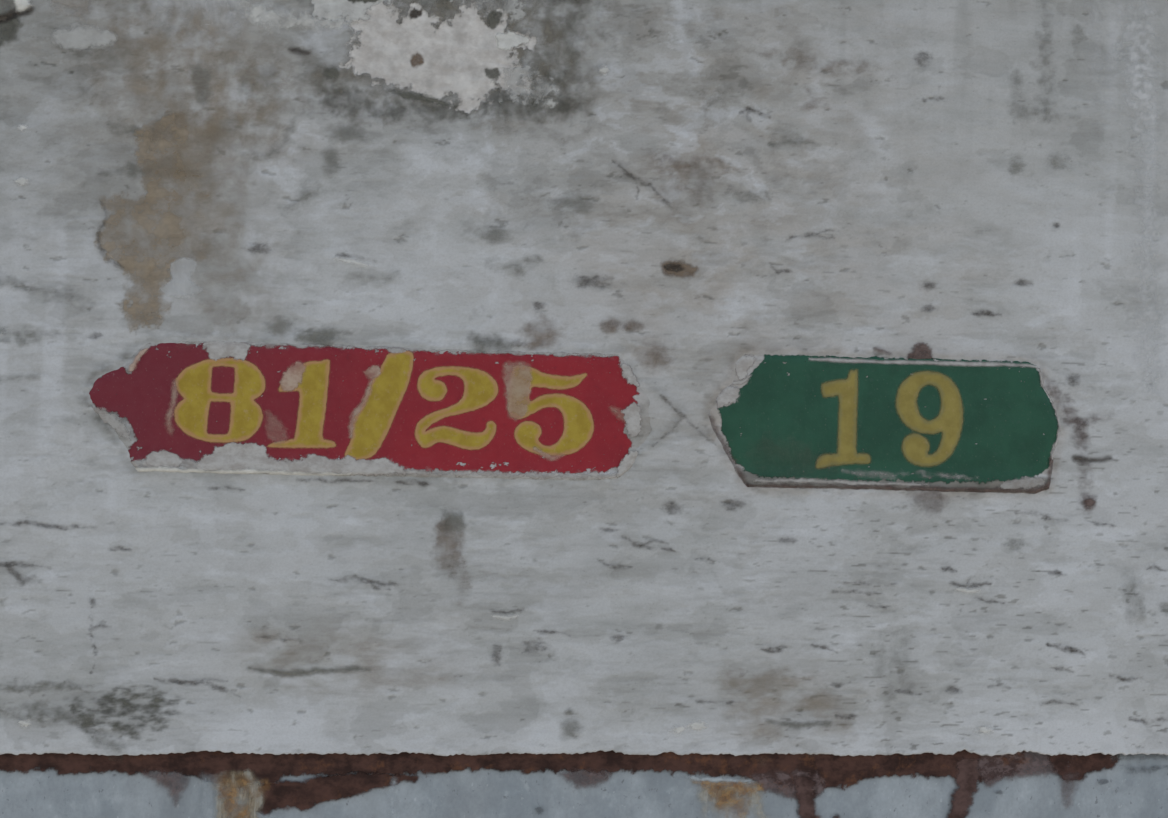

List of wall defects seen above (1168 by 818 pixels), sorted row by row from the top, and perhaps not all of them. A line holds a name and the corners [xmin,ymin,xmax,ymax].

peeling [250,0,556,113]
leakage [416,0,461,29]
leakage [477,0,576,110]
corrosion [0,750,1119,818]